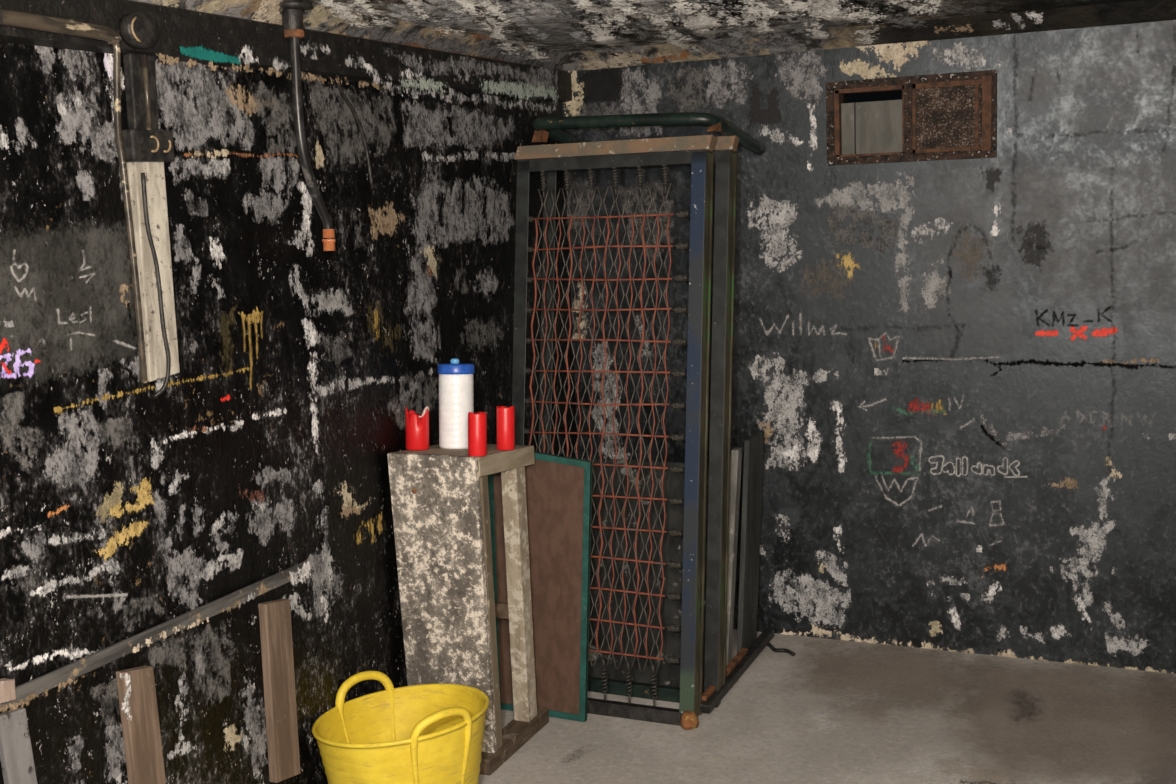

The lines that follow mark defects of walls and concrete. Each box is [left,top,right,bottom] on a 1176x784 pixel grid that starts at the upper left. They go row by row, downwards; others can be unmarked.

crack [902,357,1176,376]
crack [960,414,1066,450]
crack [939,760,1004,784]